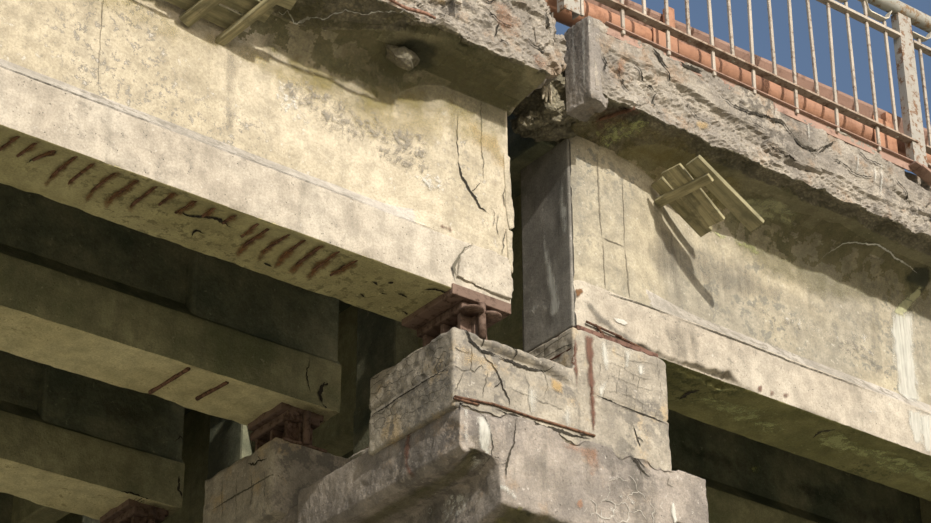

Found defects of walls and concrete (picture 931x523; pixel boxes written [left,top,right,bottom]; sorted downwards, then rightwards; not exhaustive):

crack [0,0,169,129]
corrosion [105,180,139,208]
crack [456,103,506,253]
crack [719,94,910,204]
corrosion [236,227,356,279]
crack [597,156,881,395]
crack [306,361,328,413]
crack [368,330,589,475]
corrosion [550,336,595,427]
crack [583,349,663,523]
water stain [892,287,921,400]
water stain [910,411,931,450]